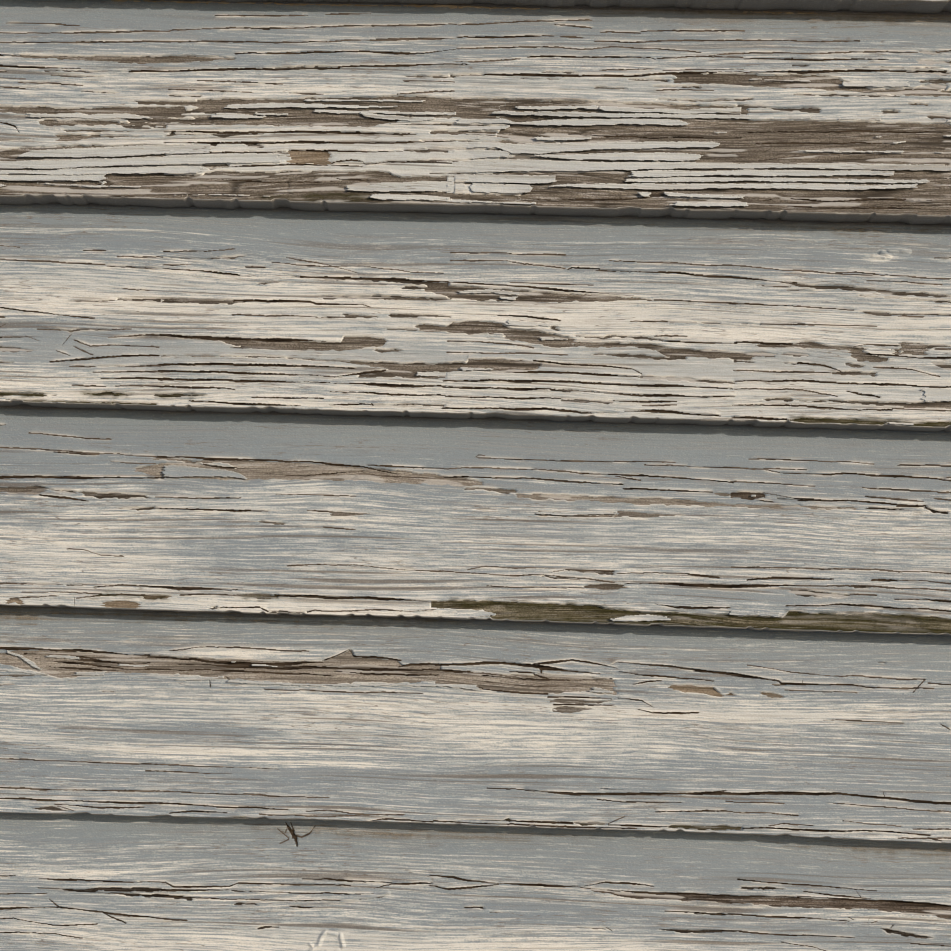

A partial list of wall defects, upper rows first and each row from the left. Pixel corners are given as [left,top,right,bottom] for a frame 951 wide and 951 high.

peeling [289,275,736,304]
peeling [596,270,951,303]
peeling [158,314,951,427]
peeling [0,392,157,405]
peeling [135,456,857,518]
peeling [307,510,367,530]
peeling [6,595,59,604]
peeling [74,593,172,608]
peeling [431,600,951,634]
peeling [0,646,617,713]
crack [0,875,654,939]
crack [659,878,951,951]